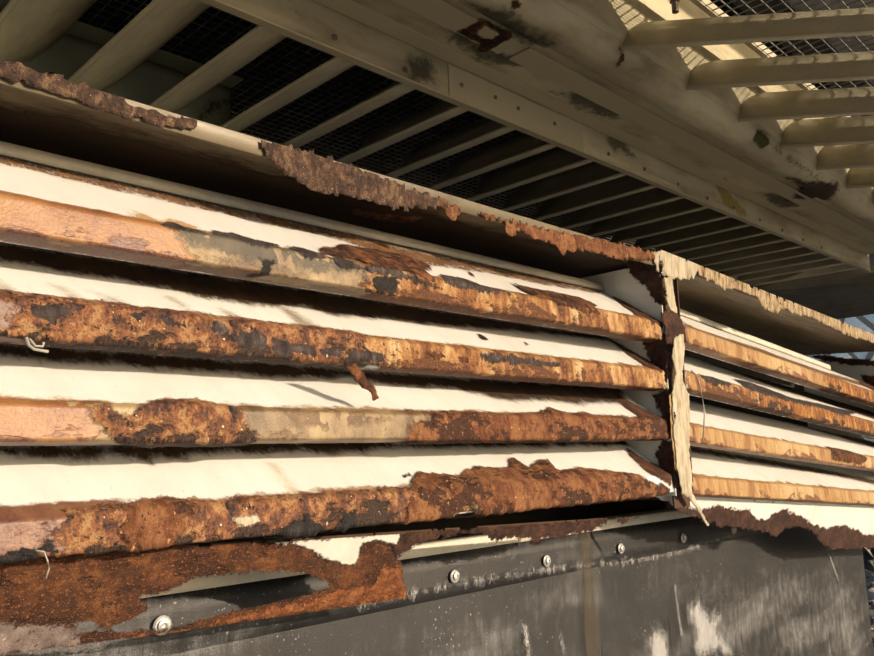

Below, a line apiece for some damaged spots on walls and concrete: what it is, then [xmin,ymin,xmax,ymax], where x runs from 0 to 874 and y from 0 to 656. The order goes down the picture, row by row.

corrosion [450,0,556,66]
leakage [409,58,433,82]
peeling [652,250,698,313]
peeling [671,334,709,526]
corrosion [0,495,637,648]
efflorescence [651,631,668,656]
efflorescence [690,604,729,655]